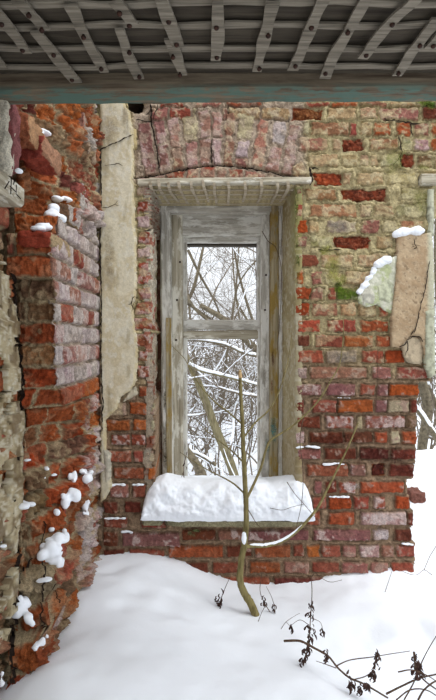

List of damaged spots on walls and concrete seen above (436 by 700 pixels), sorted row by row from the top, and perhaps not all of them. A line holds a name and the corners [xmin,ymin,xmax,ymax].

crack [99,104,287,208]
crack [384,118,420,167]
crack [97,227,105,430]
peeling [83,103,151,502]
crack [400,262,430,355]